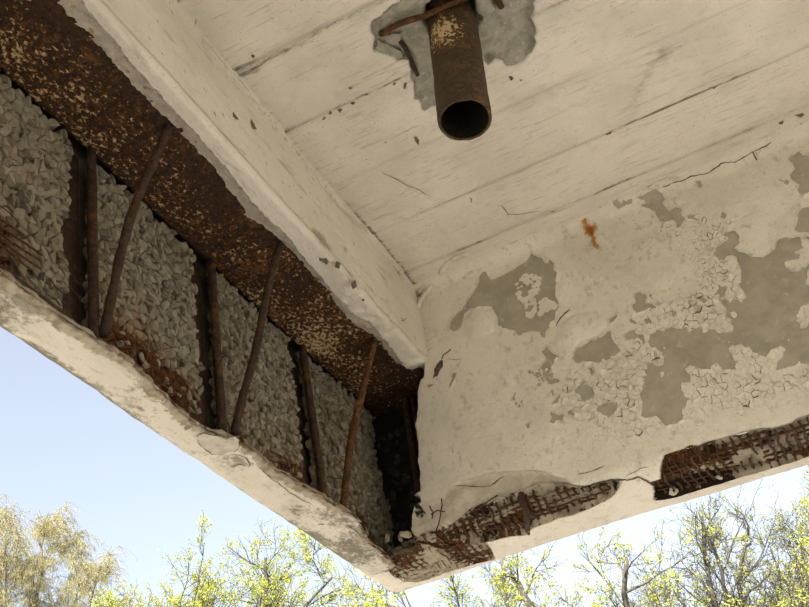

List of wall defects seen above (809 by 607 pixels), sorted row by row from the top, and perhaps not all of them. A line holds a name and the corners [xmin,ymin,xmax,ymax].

spalling [370,0,536,111]
spalling [57,0,403,365]
rust [582,218,598,249]
crack [648,142,771,187]
spalling [0,74,621,582]
peeling [445,150,809,439]
spalling [650,415,809,501]